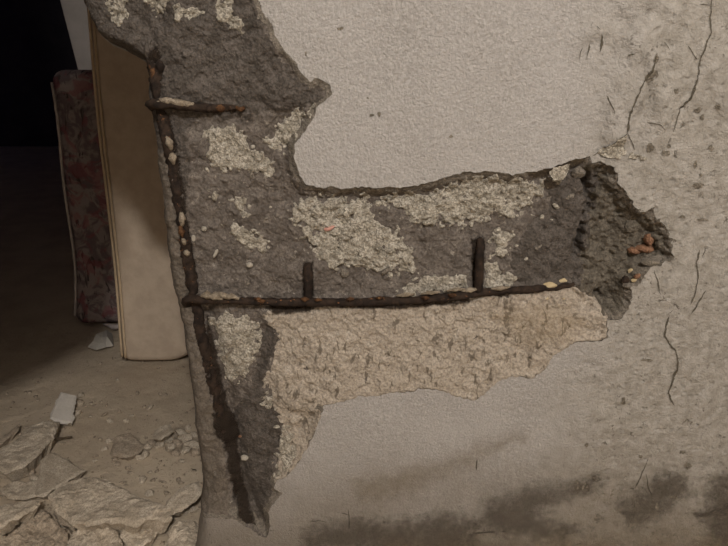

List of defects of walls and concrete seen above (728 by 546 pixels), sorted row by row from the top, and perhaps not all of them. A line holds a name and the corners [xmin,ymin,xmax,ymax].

corrosion [148,47,165,88]
crack [593,0,712,156]
corrosion [169,121,196,269]
corrosion [254,262,322,315]
spalling [84,0,674,537]
corrosion [340,293,470,309]
corrosion [471,238,484,281]
crack [664,311,679,406]
leakage [306,516,476,546]
leakage [486,479,594,538]
leakage [695,476,728,546]